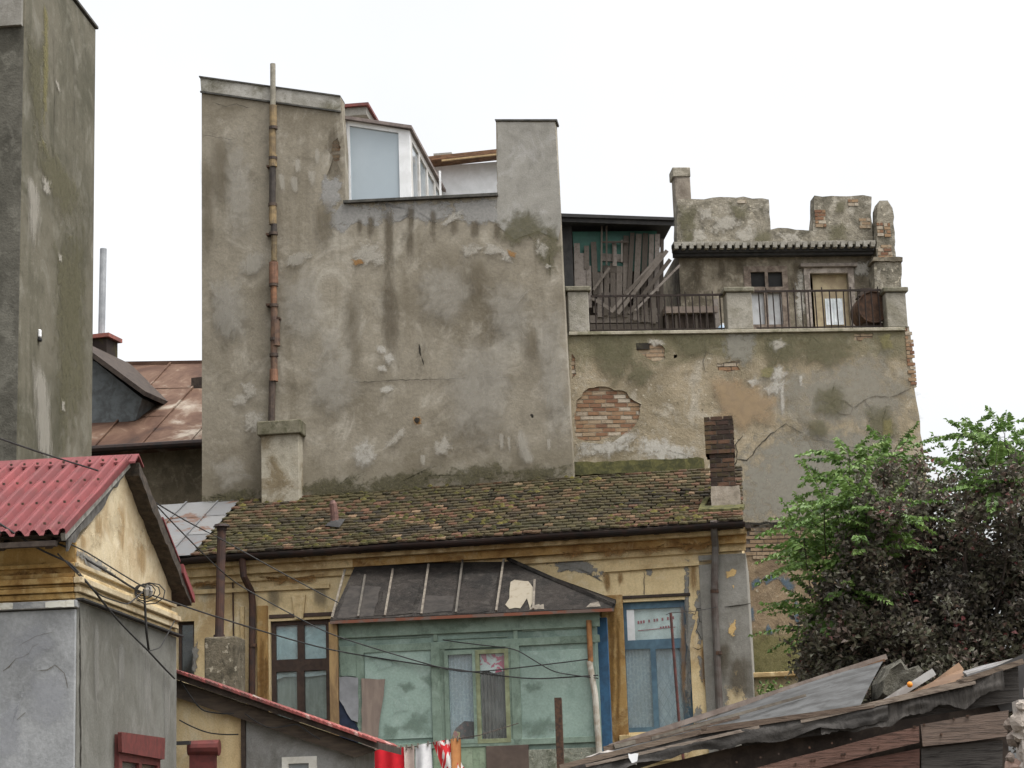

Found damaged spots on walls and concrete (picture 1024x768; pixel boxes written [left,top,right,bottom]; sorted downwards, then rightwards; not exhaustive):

water stain [377,346,394,371]
flaking render [905,326,917,388]
flaking render [574,387,641,441]
crack [837,388,911,415]
crack [734,424,801,465]
peeling [548,561,605,580]
peeling [725,685,746,706]